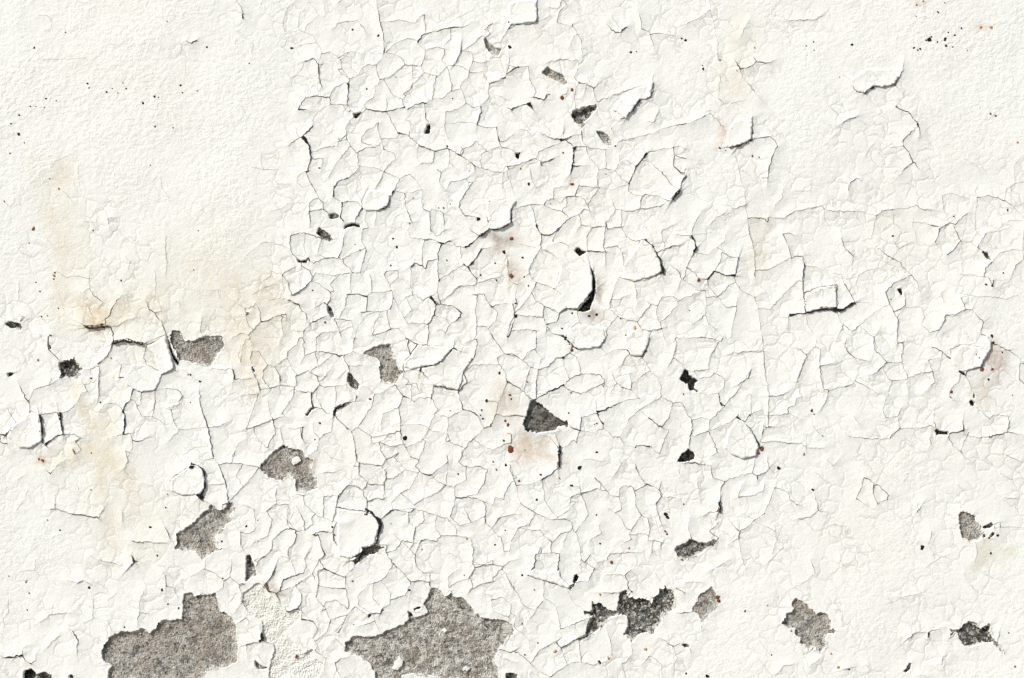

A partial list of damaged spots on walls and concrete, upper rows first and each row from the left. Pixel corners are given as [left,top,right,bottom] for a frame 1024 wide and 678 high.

crack [848,72,920,172]
crack [9,276,194,477]
peeling [364,344,473,390]
crack [172,0,868,677]
peeling [523,400,569,433]
crack [725,199,1024,401]
crack [18,484,170,566]
peeling [174,501,235,559]
crack [1,607,78,664]
peeling [101,592,238,678]
peeling [345,588,523,678]
peeling [579,584,676,642]